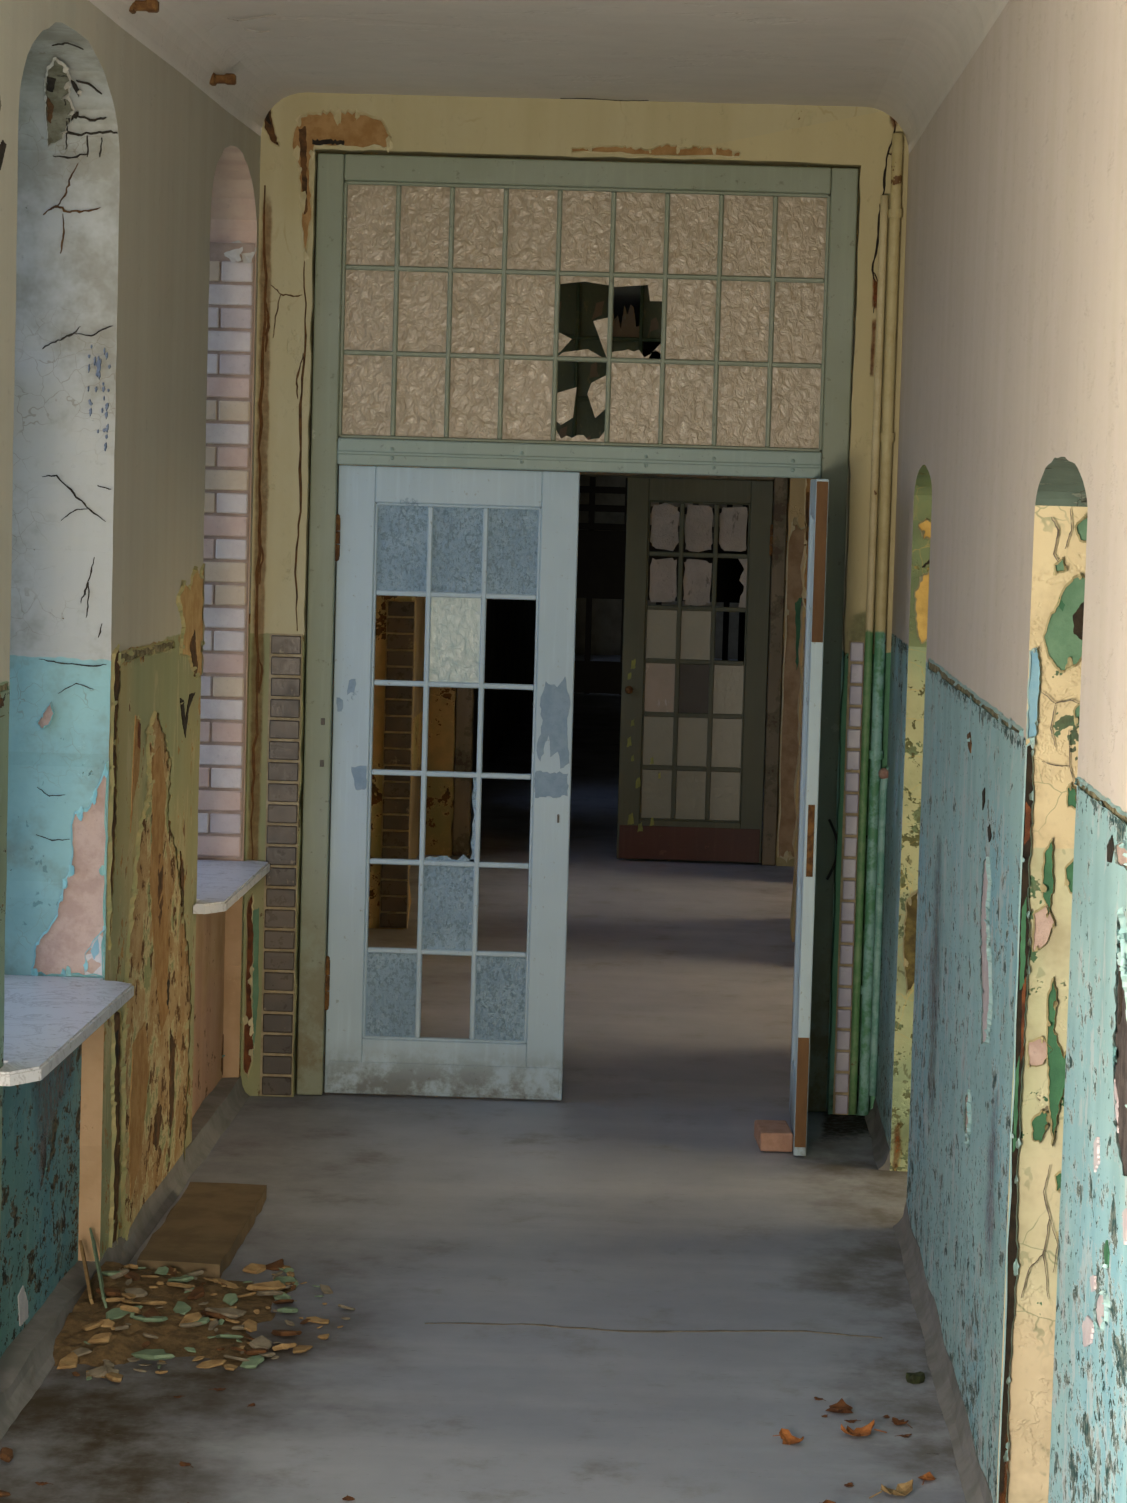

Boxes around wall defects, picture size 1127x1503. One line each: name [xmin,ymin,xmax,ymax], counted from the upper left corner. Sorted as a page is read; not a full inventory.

crack [43,42,117,254]
spalling [264,109,393,261]
crack [42,326,112,349]
crack [42,475,111,522]
peeling [0,681,9,708]
crack [41,557,107,694]
flaking render [31,240,259,1248]
peeling [1068,777,1127,870]
peeling [902,889,918,996]
peeling [914,570,1069,1503]
peeling [1093,907,1127,1177]
peeling [1082,1208,1127,1347]